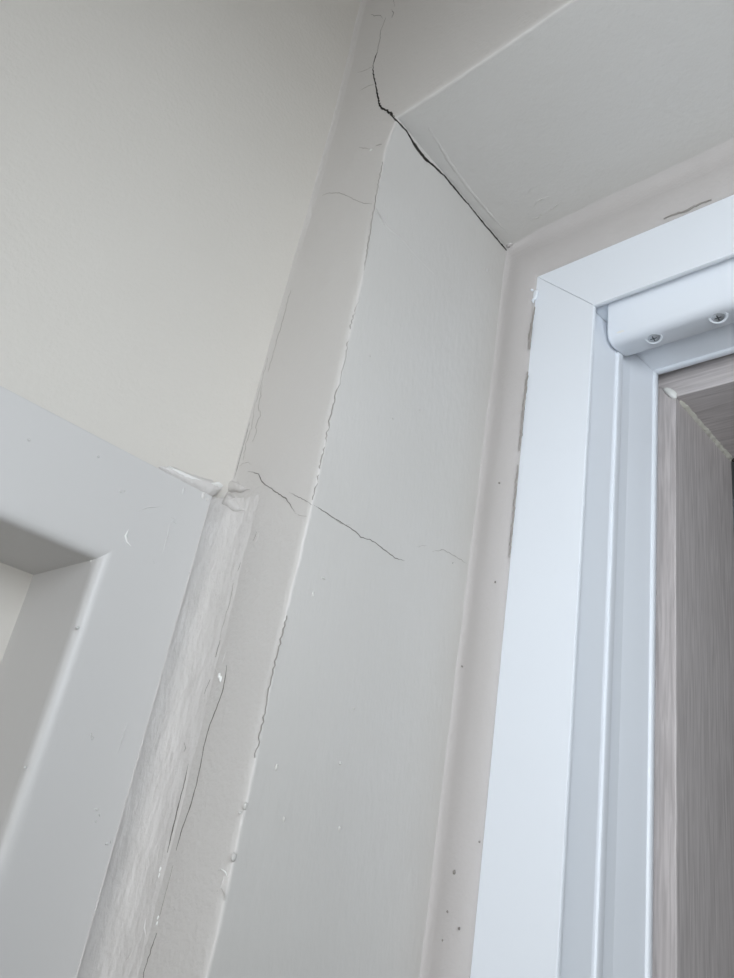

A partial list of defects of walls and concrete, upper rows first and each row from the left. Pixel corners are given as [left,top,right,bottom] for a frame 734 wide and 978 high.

crack [360,0,512,251]
crack [234,292,465,563]
crack [143,586,233,978]